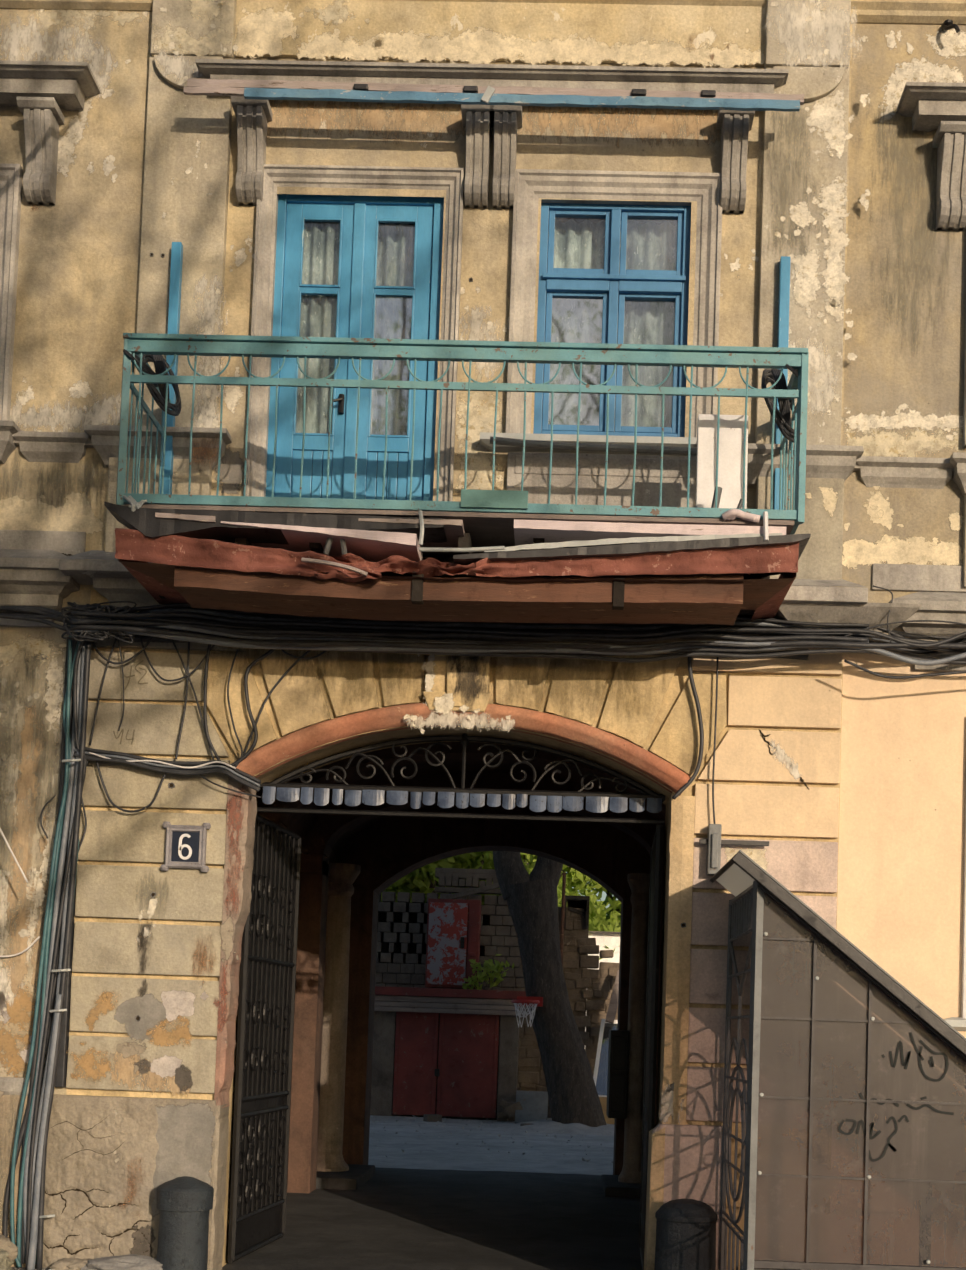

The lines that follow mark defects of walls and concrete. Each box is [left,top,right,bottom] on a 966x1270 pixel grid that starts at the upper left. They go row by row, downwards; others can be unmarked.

flaking render [29,0,868,186]
flaking render [805,28,966,159]
flaking render [775,175,966,457]
flaking render [10,378,121,432]
flaking render [189,356,244,428]
flaking render [805,486,963,569]
flaking render [404,654,515,734]
crack [759,730,809,789]
flaking render [0,636,66,1078]
flaking render [70,786,244,1096]
crack [53,1117,124,1159]
crack [43,1188,151,1256]